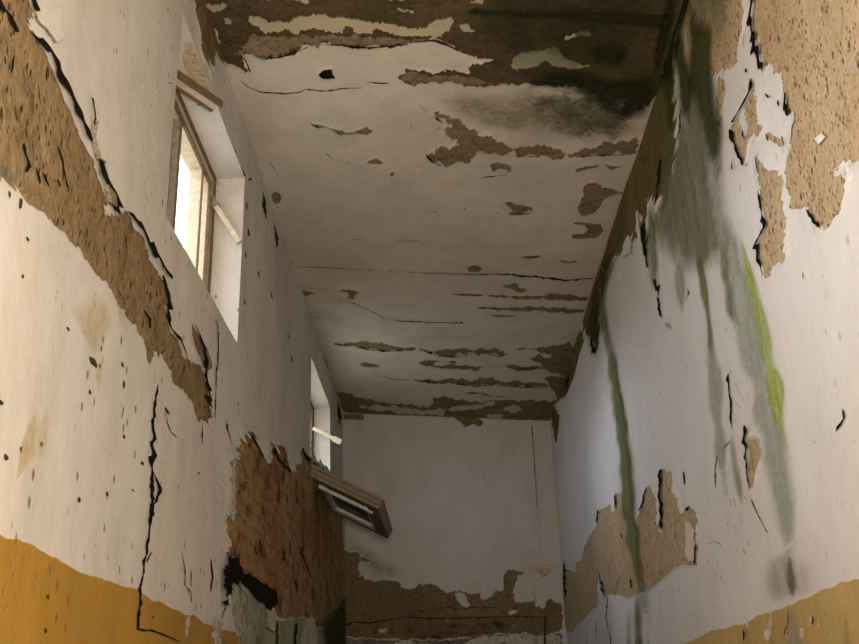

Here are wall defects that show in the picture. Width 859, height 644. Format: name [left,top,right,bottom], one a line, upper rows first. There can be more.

flaking render [0,0,214,425]
crack [201,320,238,453]
flaking render [184,0,859,446]
leakage [464,0,734,317]
leakage [589,258,611,346]
leakage [708,342,724,468]
leakage [741,247,783,435]
crack [137,384,180,642]
crack [182,554,214,601]
flaking render [210,420,703,644]
leakage [628,603,642,644]